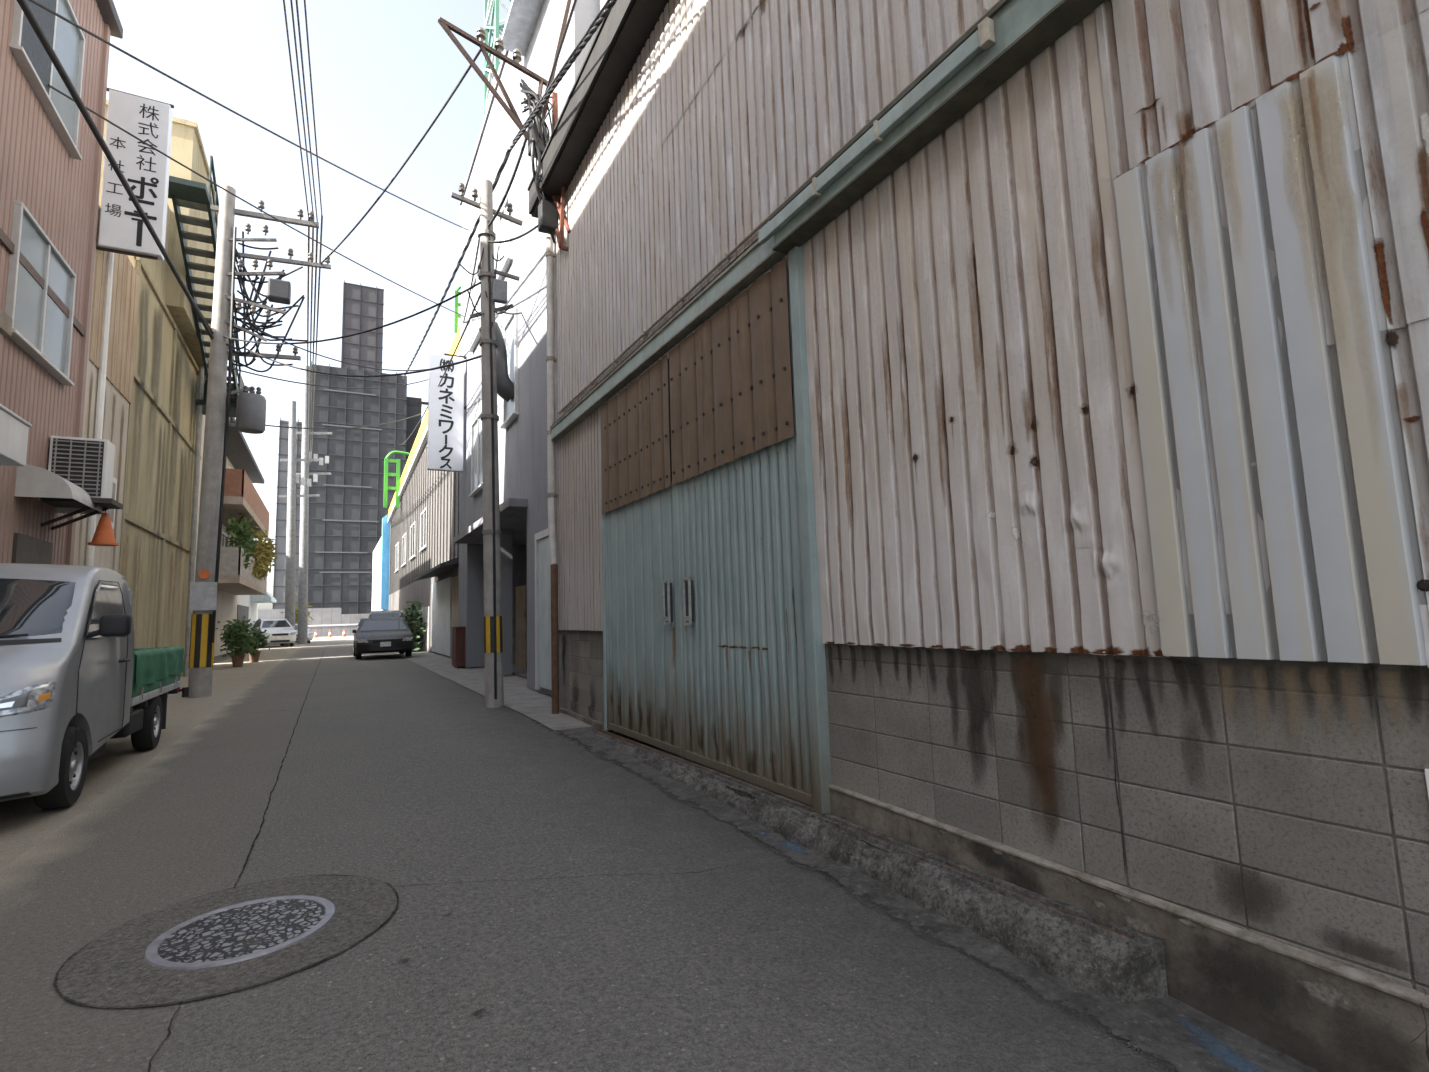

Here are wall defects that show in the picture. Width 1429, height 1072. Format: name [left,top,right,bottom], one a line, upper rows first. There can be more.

rust [1419,152,1429,251]
rust [1374,240,1399,347]
rust [1398,388,1420,425]
rust [610,692,673,745]
rust [991,645,1166,804]
water stain [1098,658,1212,752]
crack [128,655,728,1072]
water stain [971,843,1042,893]
crack [55,944,88,1005]
water stain [1334,935,1396,968]